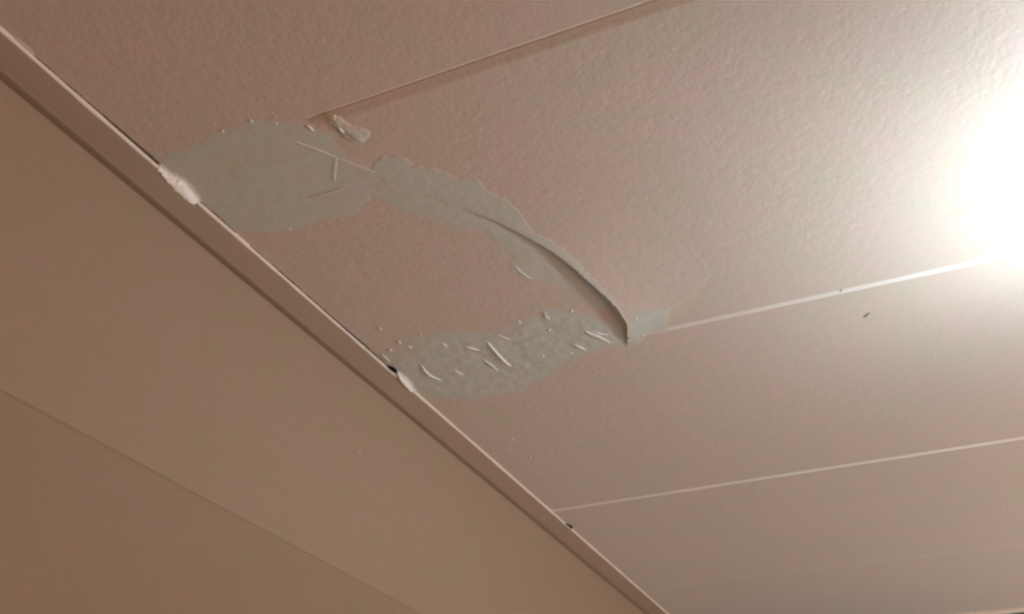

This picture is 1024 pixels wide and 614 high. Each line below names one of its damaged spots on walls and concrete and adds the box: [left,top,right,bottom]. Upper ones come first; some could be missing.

peeling [325,113,371,143]